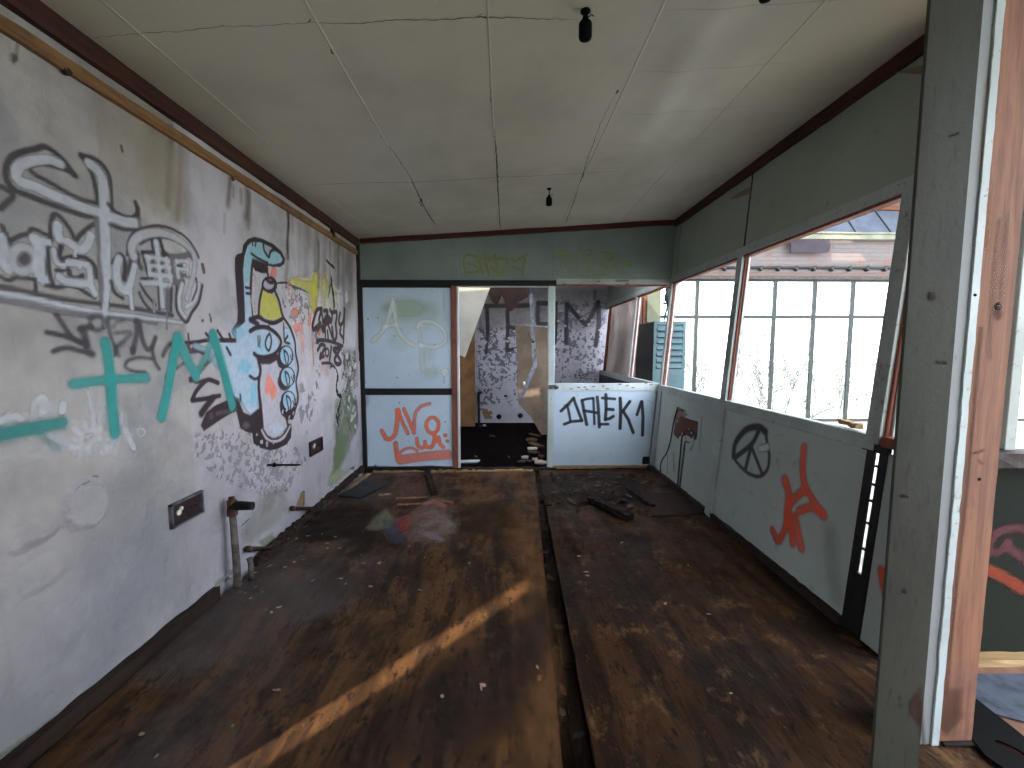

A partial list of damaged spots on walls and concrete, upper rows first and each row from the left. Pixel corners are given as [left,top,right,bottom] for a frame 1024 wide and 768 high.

crack [107,13,579,54]
crack [316,78,619,226]
peeling [477,327,518,419]